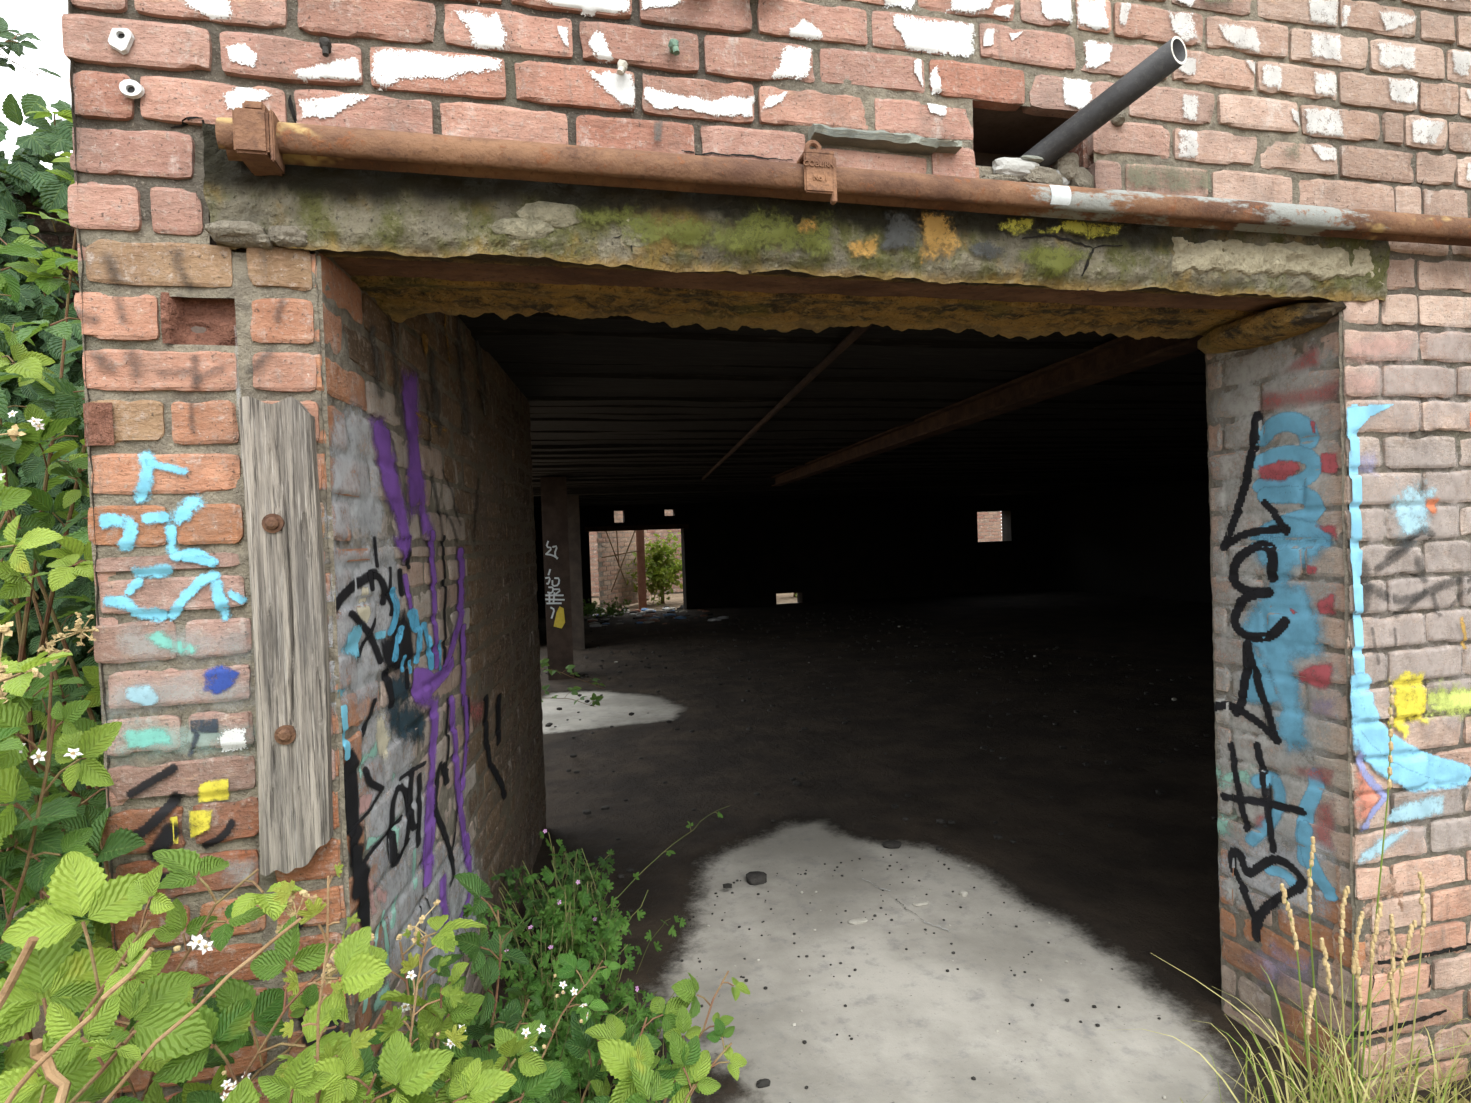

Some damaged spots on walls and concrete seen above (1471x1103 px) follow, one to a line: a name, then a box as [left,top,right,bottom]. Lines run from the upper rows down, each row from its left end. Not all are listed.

water stain [880,211,918,251]
rust [920,213,961,263]